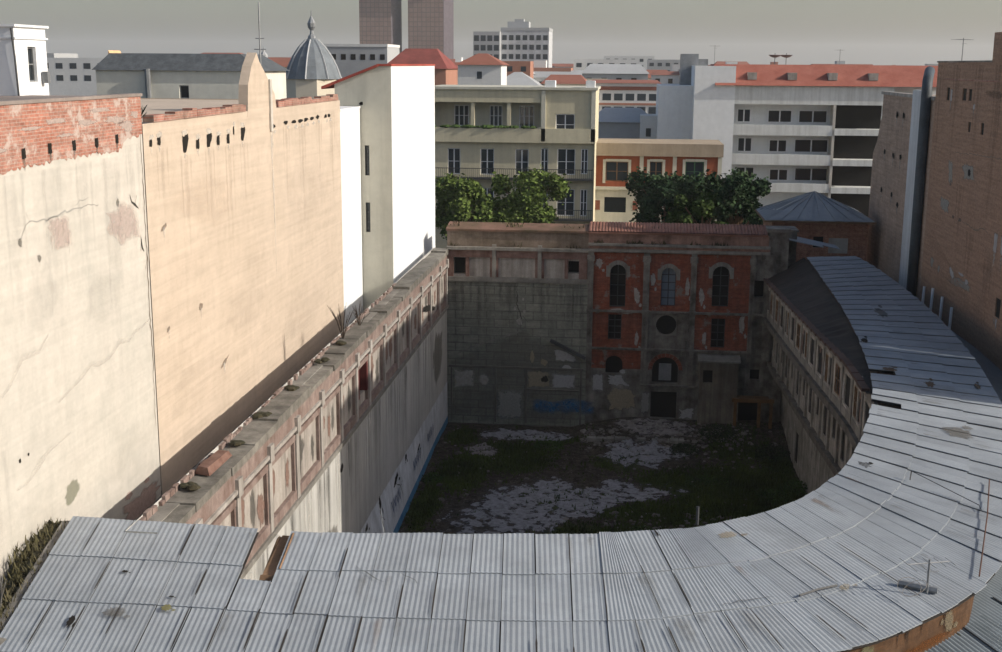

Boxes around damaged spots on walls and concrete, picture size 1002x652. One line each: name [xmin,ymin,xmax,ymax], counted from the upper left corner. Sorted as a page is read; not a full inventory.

spalling [0,96,161,175]
crack [17,198,99,247]
flaking render [498,350,576,418]
flaking render [592,369,629,391]
flaking render [124,477,160,521]